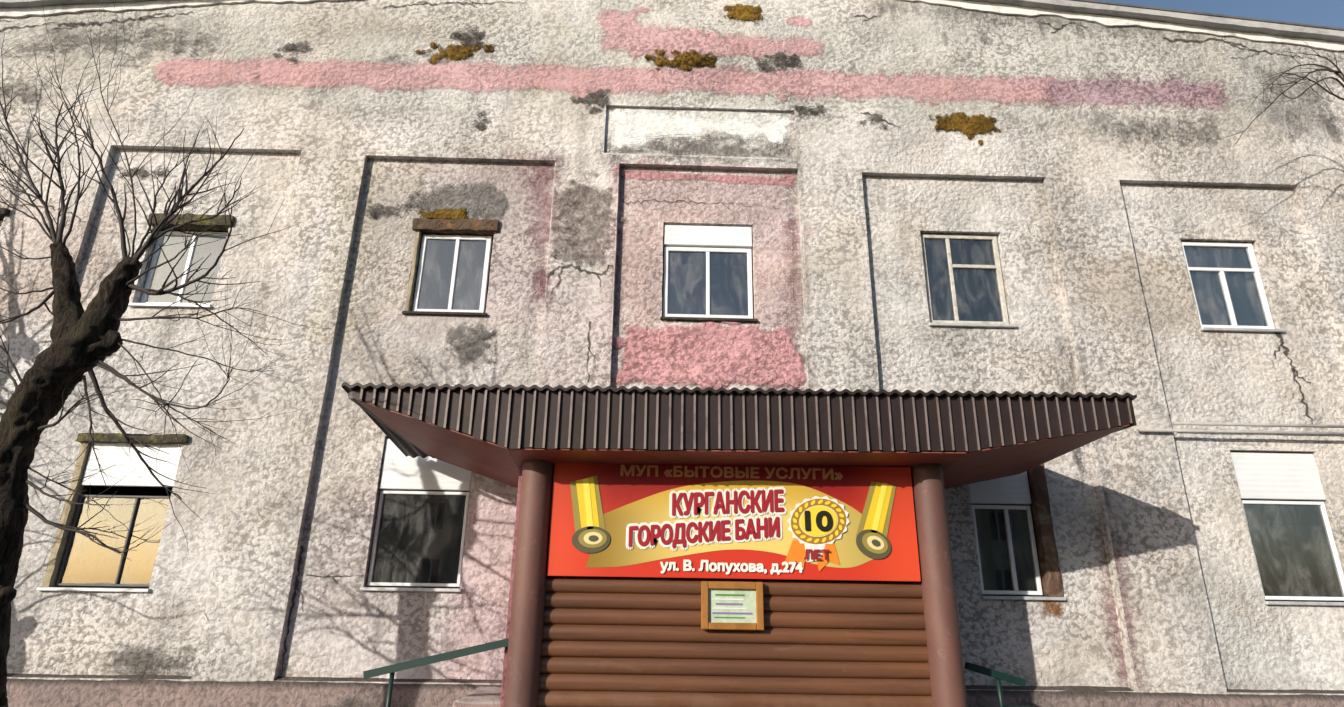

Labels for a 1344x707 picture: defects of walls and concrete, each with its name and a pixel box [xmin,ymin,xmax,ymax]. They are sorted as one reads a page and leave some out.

crack [0,11,193,32]
peeling [155,4,1228,150]
spalling [363,180,508,227]
spalling [548,165,795,274]
crack [1272,333,1313,424]